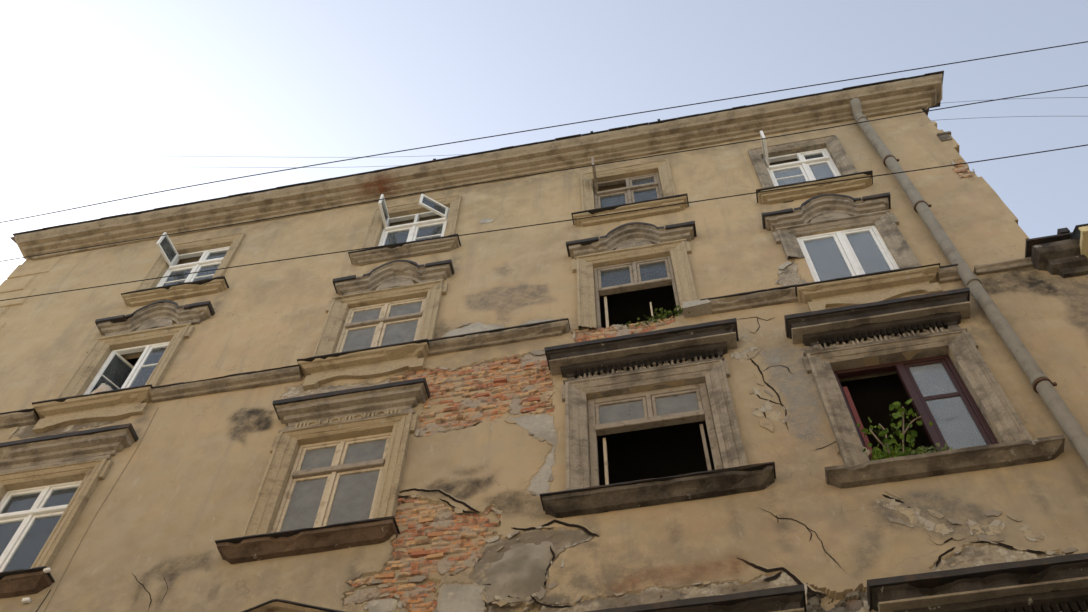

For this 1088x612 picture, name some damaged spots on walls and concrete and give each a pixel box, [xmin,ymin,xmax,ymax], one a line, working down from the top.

flaking render [951,160,975,179]
flaking render [775,261,807,286]
flaking render [441,322,505,338]
flaking render [572,316,675,342]
crack [741,317,791,429]
flaking render [281,349,558,496]
flaking render [344,494,870,612]
crack [737,557,827,596]
crack [762,509,841,567]
flaking render [875,490,1079,572]